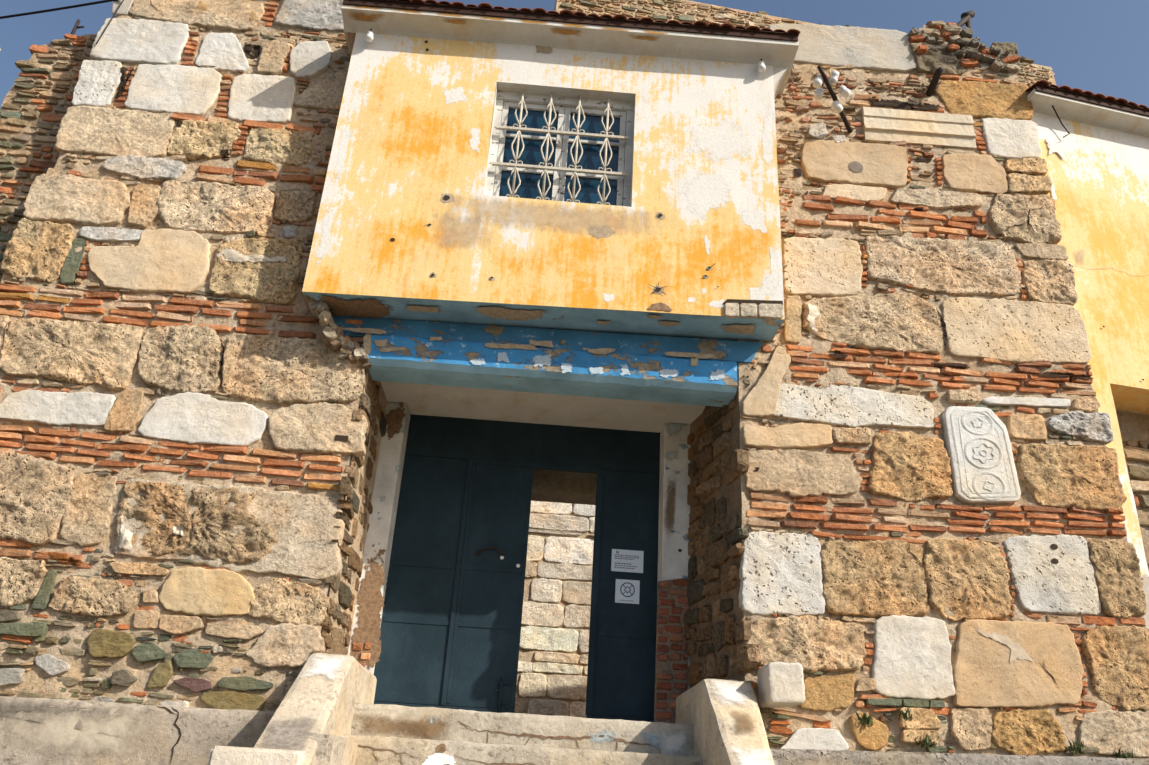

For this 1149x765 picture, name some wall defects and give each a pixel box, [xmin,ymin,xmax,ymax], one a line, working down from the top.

peeling [679,105,775,233]
flaking render [303,292,440,375]
peeling [473,307,547,321]
peeling [470,339,573,373]
peeling [583,348,616,374]
flaking render [647,286,679,326]
peeling [660,351,726,380]
flaking render [688,235,784,335]
flaking render [303,543,386,679]
crack [157,706,182,764]
crack [358,745,420,764]
crack [458,720,692,765]